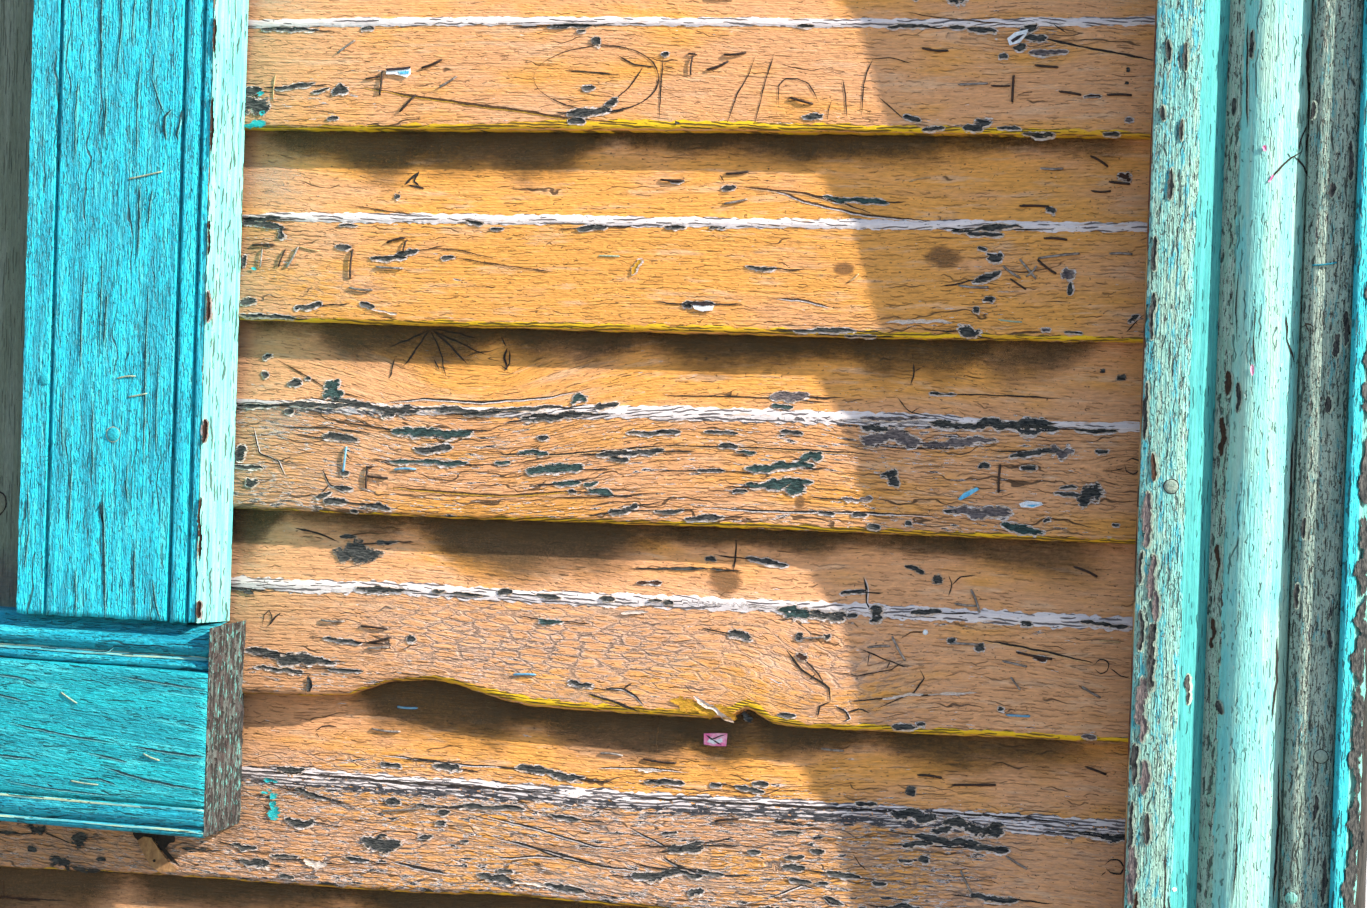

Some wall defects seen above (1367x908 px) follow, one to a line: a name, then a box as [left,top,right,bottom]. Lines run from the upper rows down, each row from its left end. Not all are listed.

peeling [245,82,350,116]
damp [926,247,961,267]
peeling [236,377,620,469]
peeling [509,429,742,523]
peeling [729,428,874,519]
peeling [837,415,1118,473]
peeling [776,588,887,625]
peeling [244,635,390,692]
peeling [1320,439,1367,908]
peeling [854,785,1011,856]
peeling [182,834,434,871]
peeling [609,837,747,900]